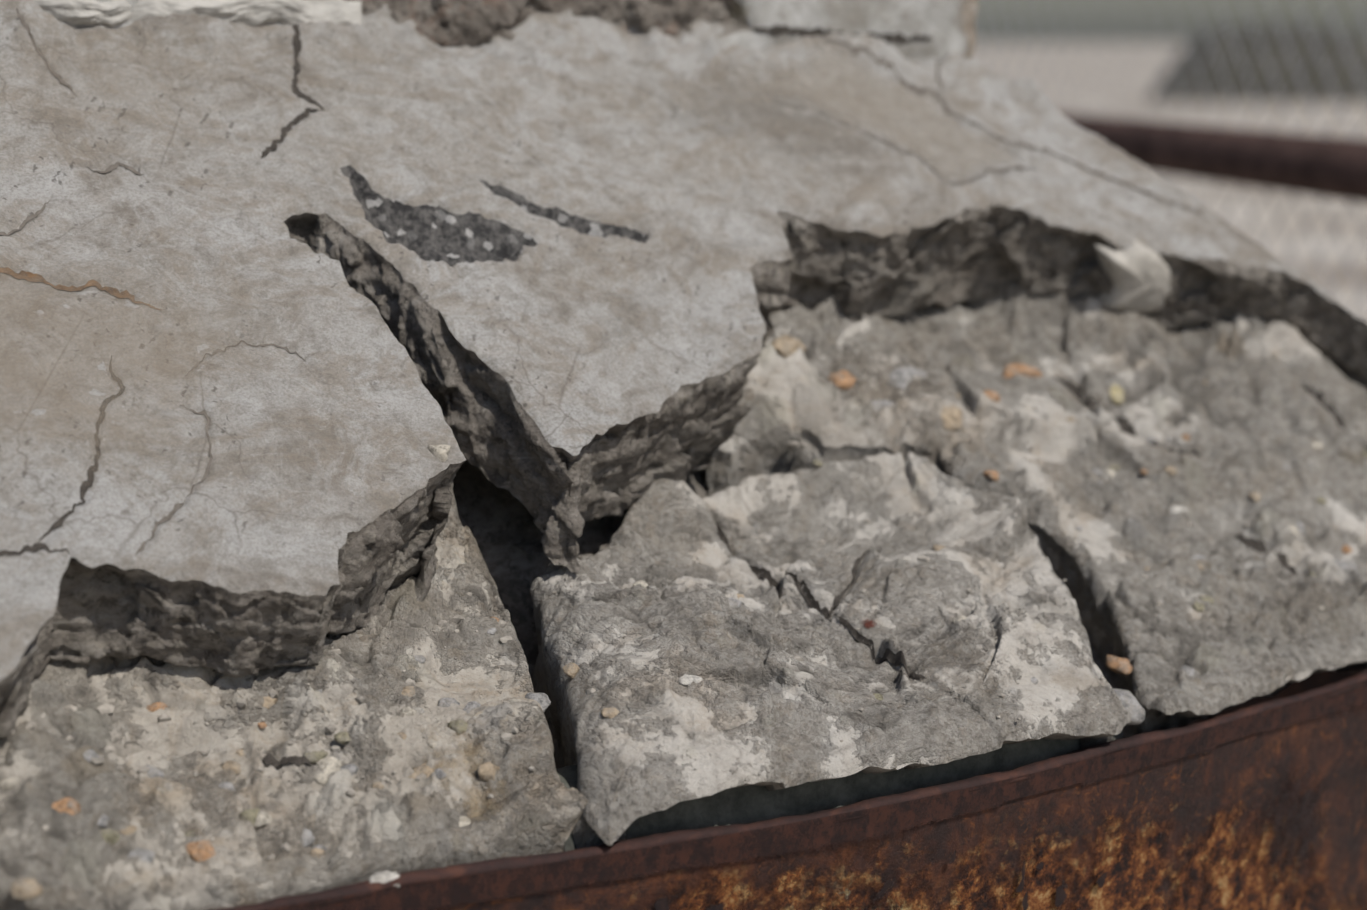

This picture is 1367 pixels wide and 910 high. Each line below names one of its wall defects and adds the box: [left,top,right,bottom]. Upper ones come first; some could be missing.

crack [261,24,324,158]
spalling [345,0,752,48]
crack [0,201,161,310]
spalling [341,165,537,267]
spalling [478,179,648,243]
crack [0,355,126,556]
crack [136,340,304,554]
crack [284,213,592,575]
spalling [579,205,1367,522]
spalling [0,460,466,740]
crack [715,523,932,681]
rust [263,680,1367,910]